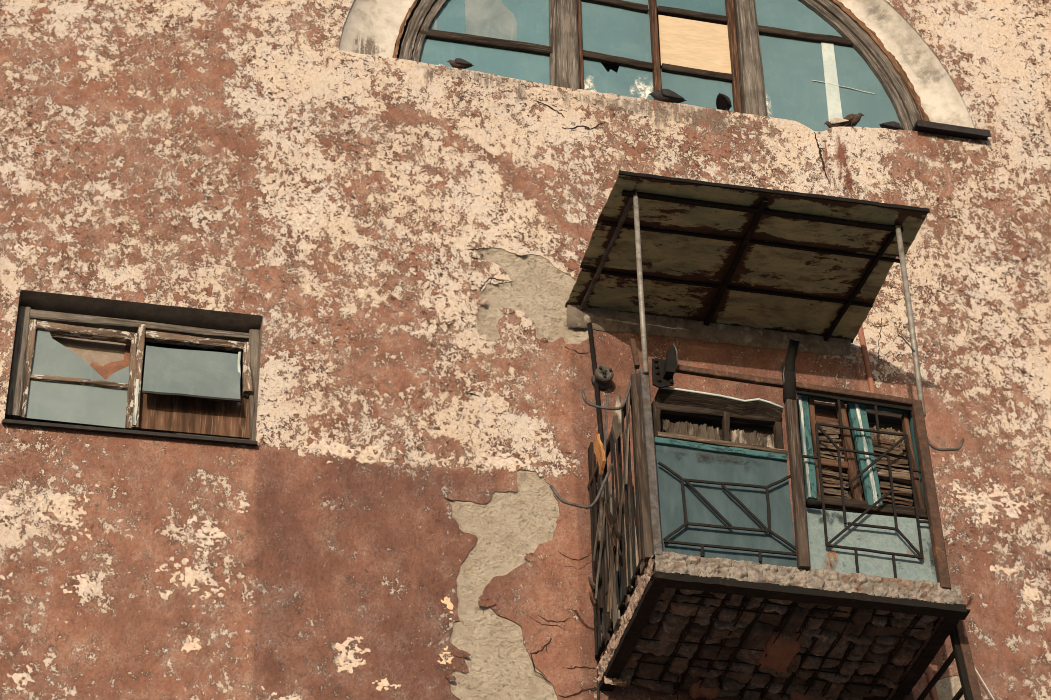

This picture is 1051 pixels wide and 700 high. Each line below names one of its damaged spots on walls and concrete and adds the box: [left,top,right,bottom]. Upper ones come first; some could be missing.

crack [814,132,830,183]
spalling [469,247,589,350]
peeling [293,433,403,464]
peeling [0,484,99,551]
peeling [60,574,103,599]
peeling [155,515,230,608]
spalling [437,441,560,700]
peeling [3,665,35,690]
peeling [181,635,202,653]
peeling [334,636,371,674]
peeling [372,678,401,691]
spalling [596,551,965,700]